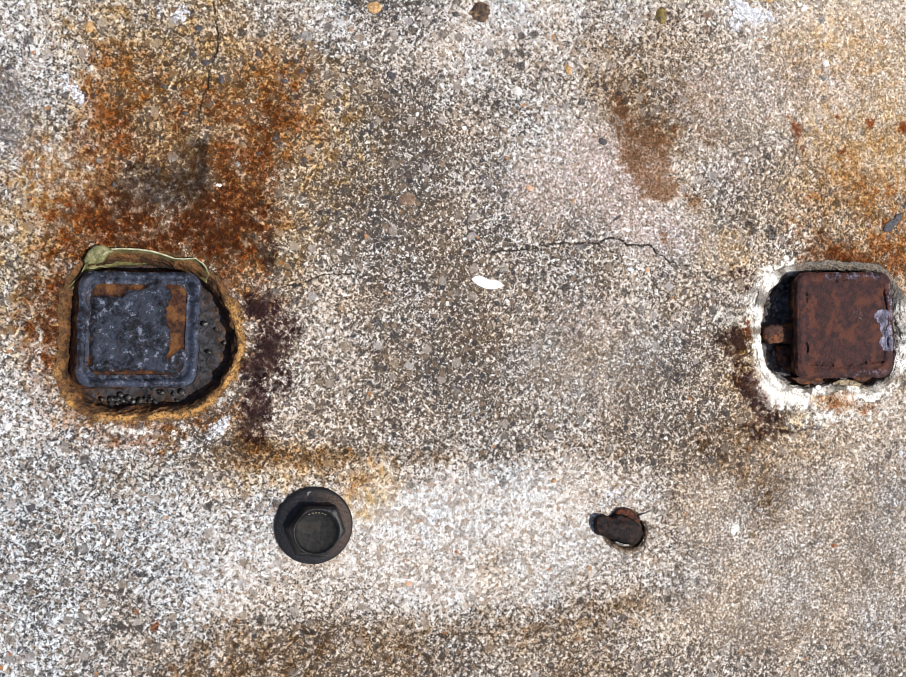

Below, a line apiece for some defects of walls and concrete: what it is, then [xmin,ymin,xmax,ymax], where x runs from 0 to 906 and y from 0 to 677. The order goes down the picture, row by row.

crack [884,202,906,233]
crack [481,237,686,269]
crack [250,271,406,293]
spalling [751,260,906,399]
rust [240,294,301,445]